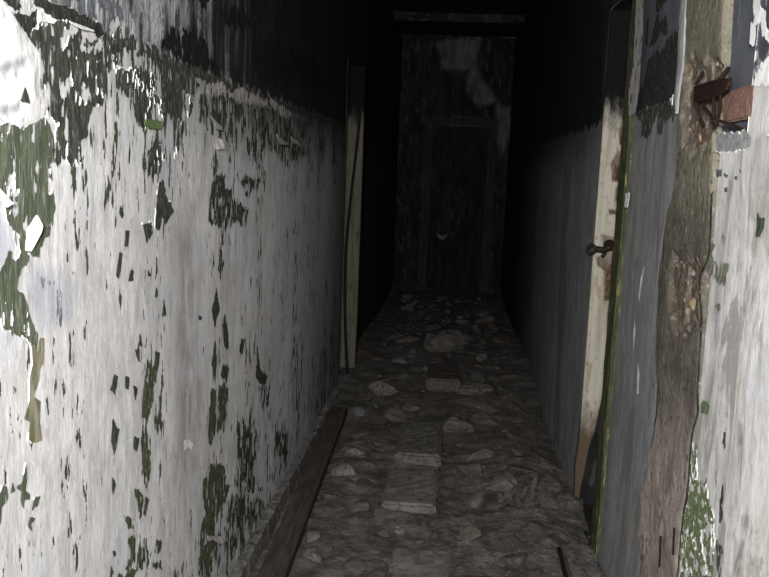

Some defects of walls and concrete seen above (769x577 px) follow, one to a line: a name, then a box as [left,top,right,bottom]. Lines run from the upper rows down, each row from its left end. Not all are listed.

peeling [628,0,679,140]
peeling [749,0,769,47]
peeling [754,56,769,86]
peeling [0,0,337,447]
peeling [110,334,162,577]
peeling [198,417,264,577]
peeling [275,422,288,466]